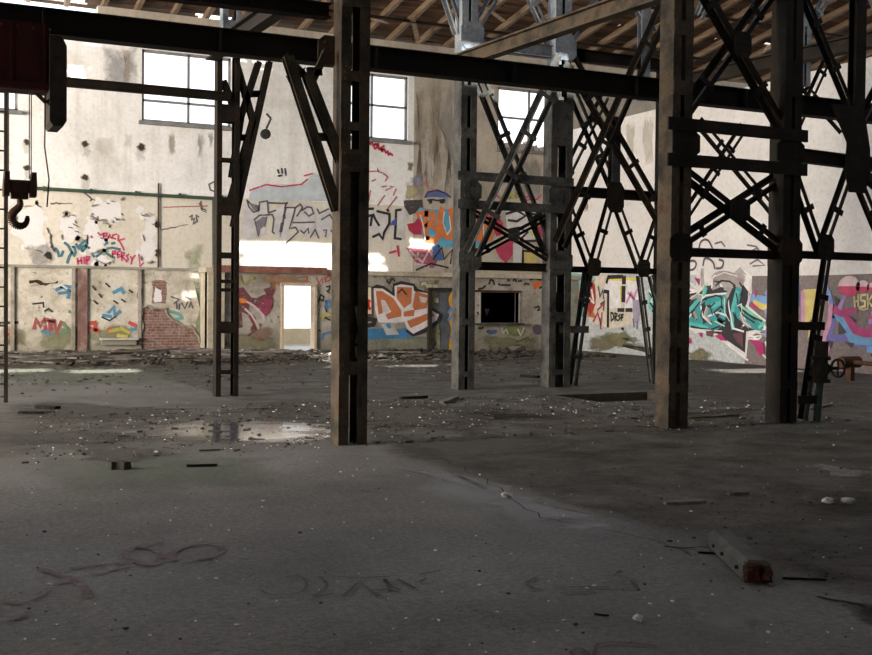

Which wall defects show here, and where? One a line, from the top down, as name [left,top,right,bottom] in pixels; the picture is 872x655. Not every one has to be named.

peeling [8,197,126,266]
peeling [135,206,161,264]
flaking render [137,280,201,350]
crack [817,596,872,613]